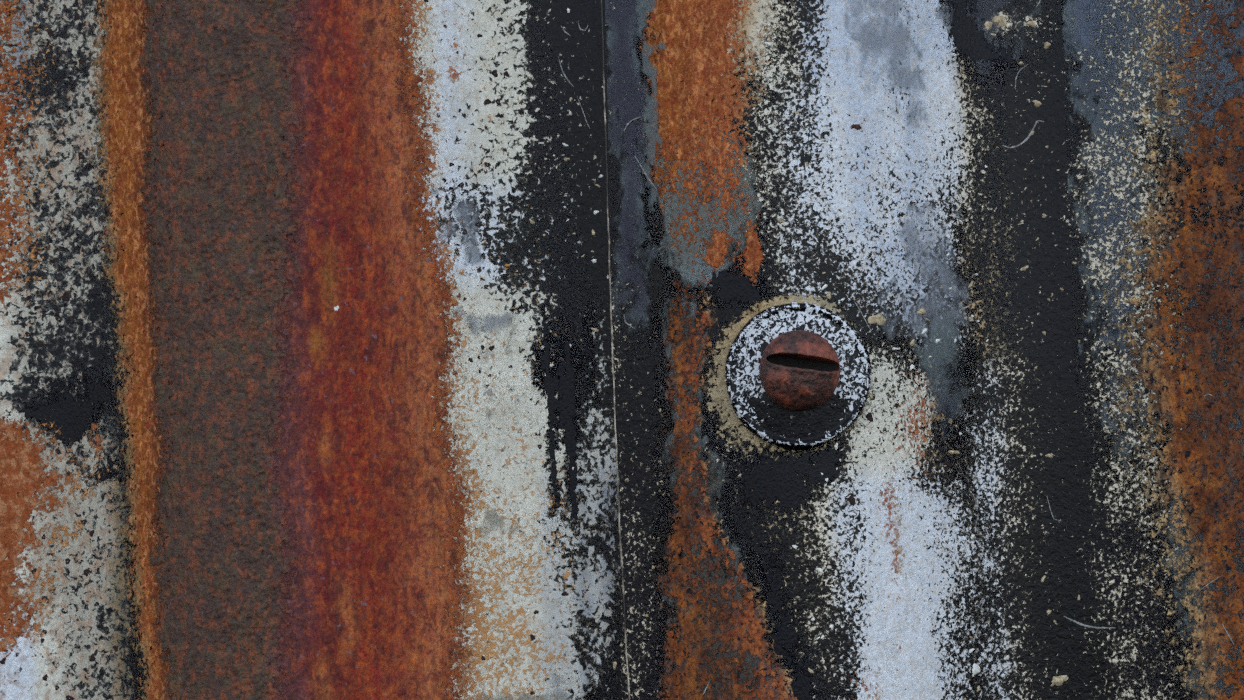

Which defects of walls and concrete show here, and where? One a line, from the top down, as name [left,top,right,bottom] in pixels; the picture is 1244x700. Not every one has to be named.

rust [0,0,602,700]
rust [638,0,886,700]
rust [1100,0,1244,700]